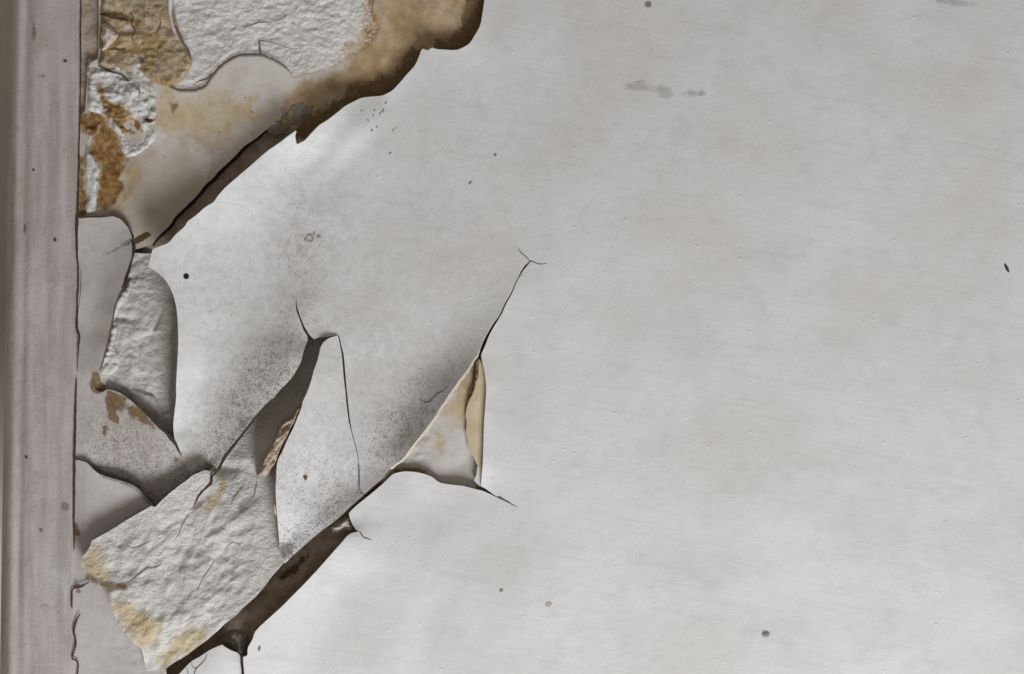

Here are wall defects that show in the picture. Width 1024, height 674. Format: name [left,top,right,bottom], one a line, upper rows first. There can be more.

leakage [280,48,421,140]
peeling [73,0,528,674]
crack [296,301,313,340]
crack [479,249,547,356]
crack [338,337,360,488]